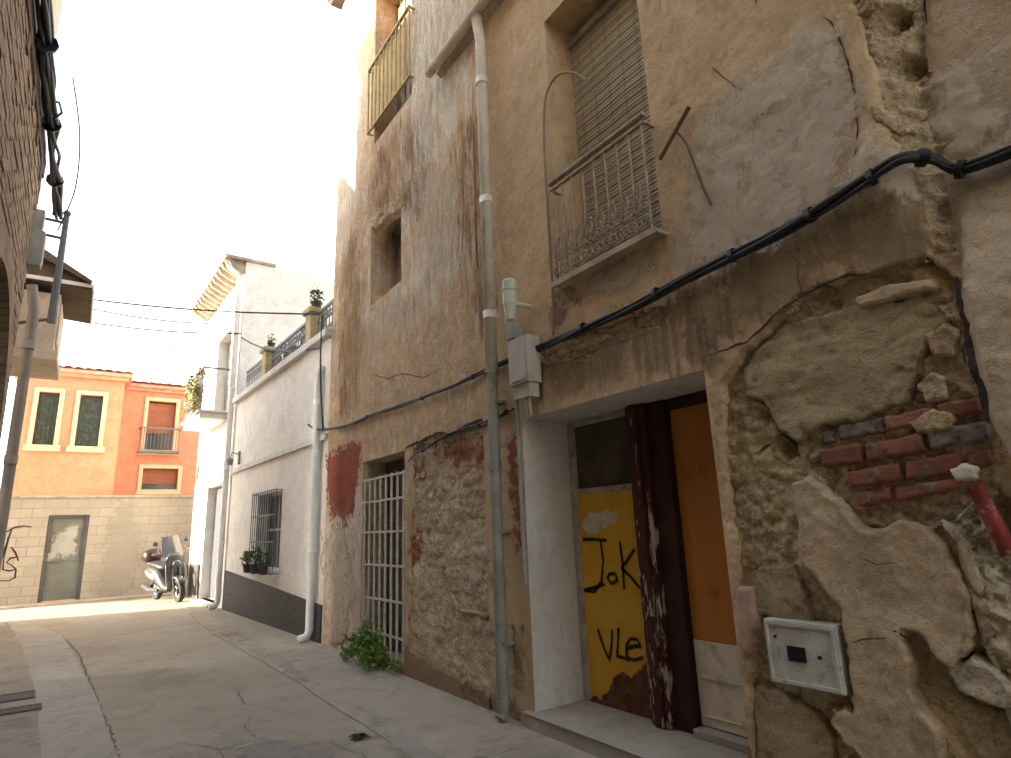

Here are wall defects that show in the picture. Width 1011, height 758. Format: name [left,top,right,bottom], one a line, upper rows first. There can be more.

damp [335,0,484,416]
flaking render [726,0,1011,758]
flaking render [407,424,494,617]
crack [63,636,121,758]
crack [147,683,366,758]